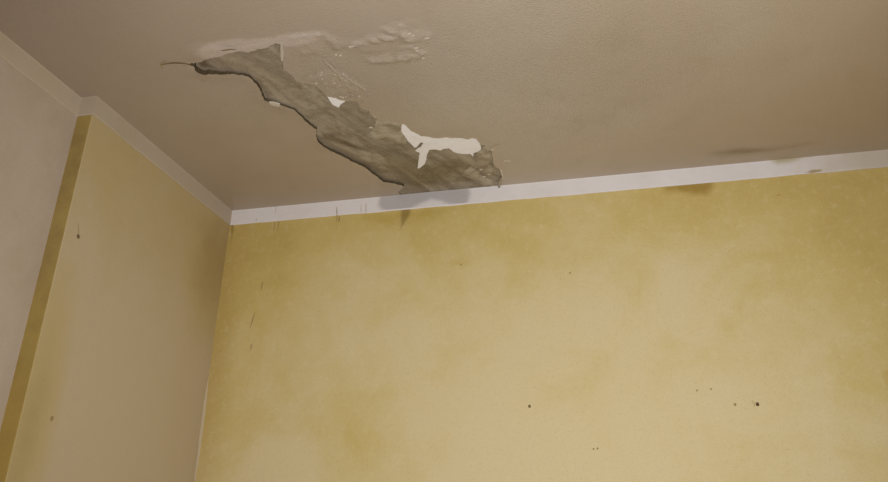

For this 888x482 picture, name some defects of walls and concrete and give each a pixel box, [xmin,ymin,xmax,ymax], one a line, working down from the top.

flaking render [187,43,509,195]